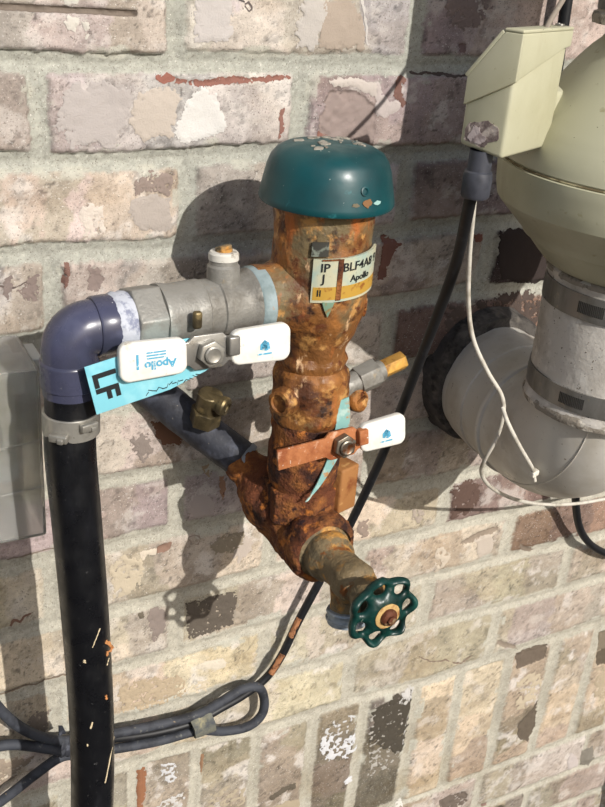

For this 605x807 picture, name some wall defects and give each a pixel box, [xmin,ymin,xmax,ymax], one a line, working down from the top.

spalling [156,72,291,88]
spalling [317,75,407,146]
water stain [320,715,357,761]
water stain [367,685,414,776]
corrosion [136,767,147,807]